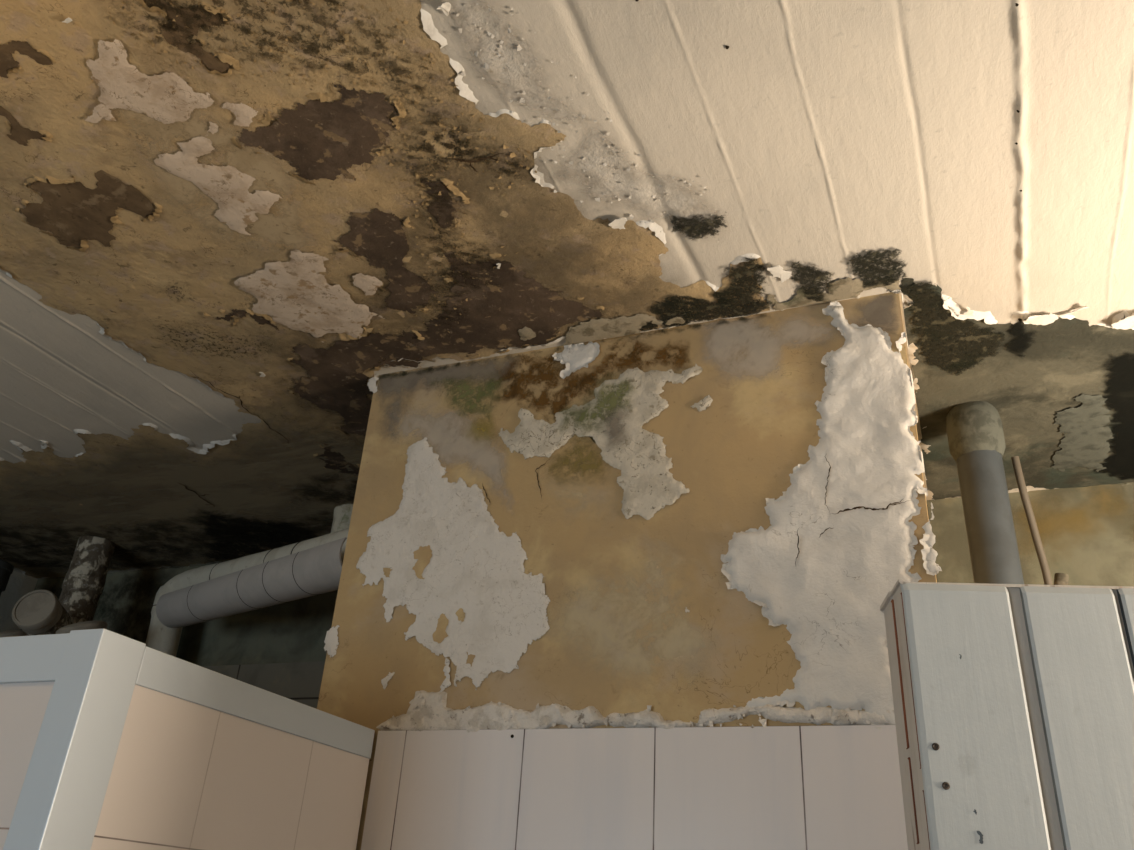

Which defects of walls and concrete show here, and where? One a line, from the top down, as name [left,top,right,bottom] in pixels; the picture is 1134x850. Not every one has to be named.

damp [135,0,522,321]
peeling [0,0,792,491]
damp [671,215,727,240]
damp [636,258,834,377]
damp [847,249,1034,376]
damp [378,360,515,487]
damp [565,382,630,439]
damp [1095,353,1134,480]
damp [0,436,363,641]
flaking render [356,278,1134,733]
crack [795,455,911,565]